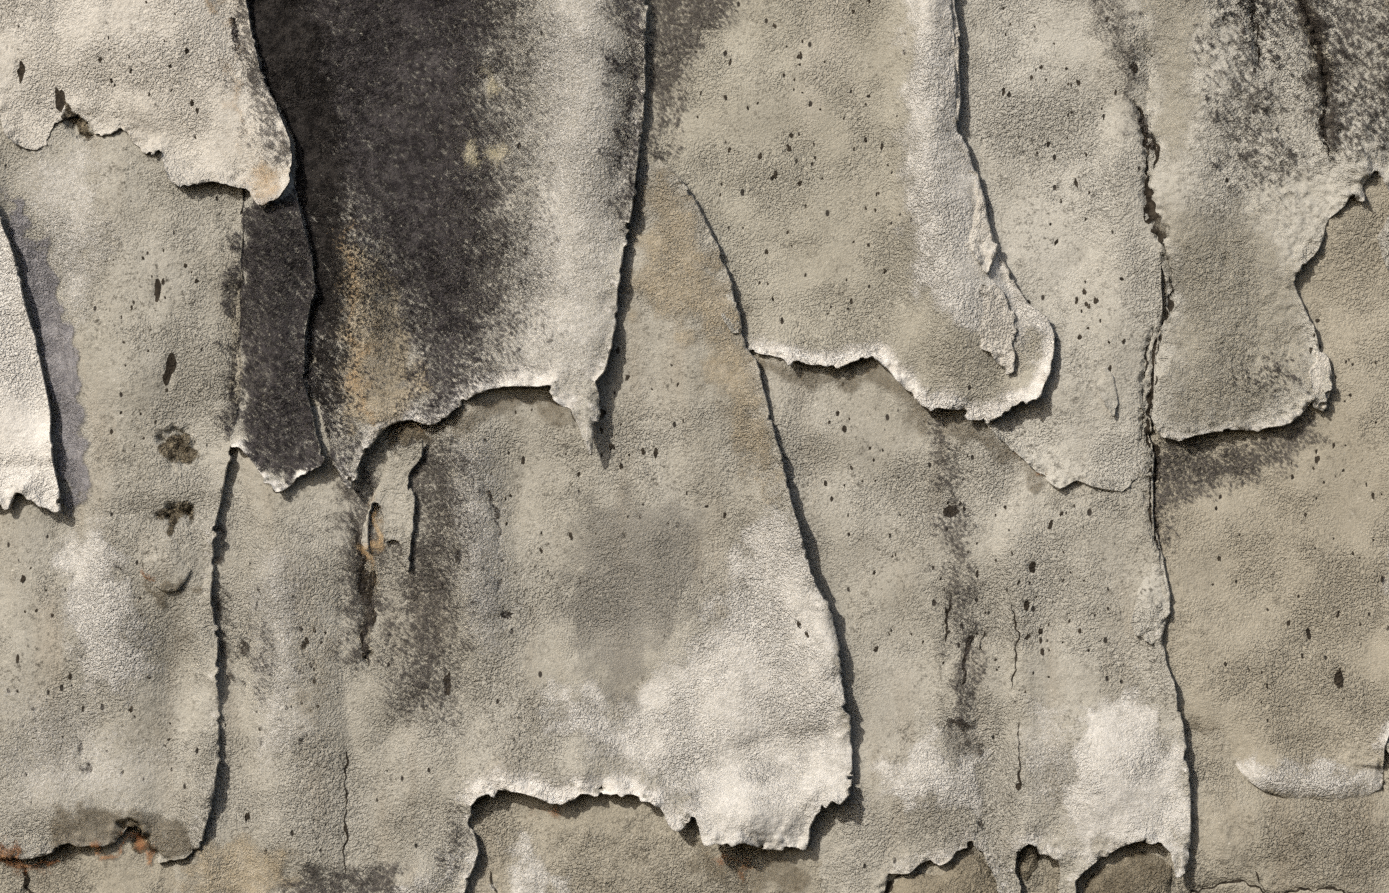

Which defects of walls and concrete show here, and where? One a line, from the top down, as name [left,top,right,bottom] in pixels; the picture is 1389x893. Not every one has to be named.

spalling [17,61,25,83]
spalling [55,88,66,112]
spalling [61,102,75,119]
damp [896,0,1052,343]
damp [1081,0,1389,426]
crack [1251,0,1261,63]
crack [1298,0,1331,157]
peeling [305,327,352,405]
damp [214,0,783,760]
crack [1136,106,1174,548]
damp [539,506,852,864]
damp [1236,757,1383,798]